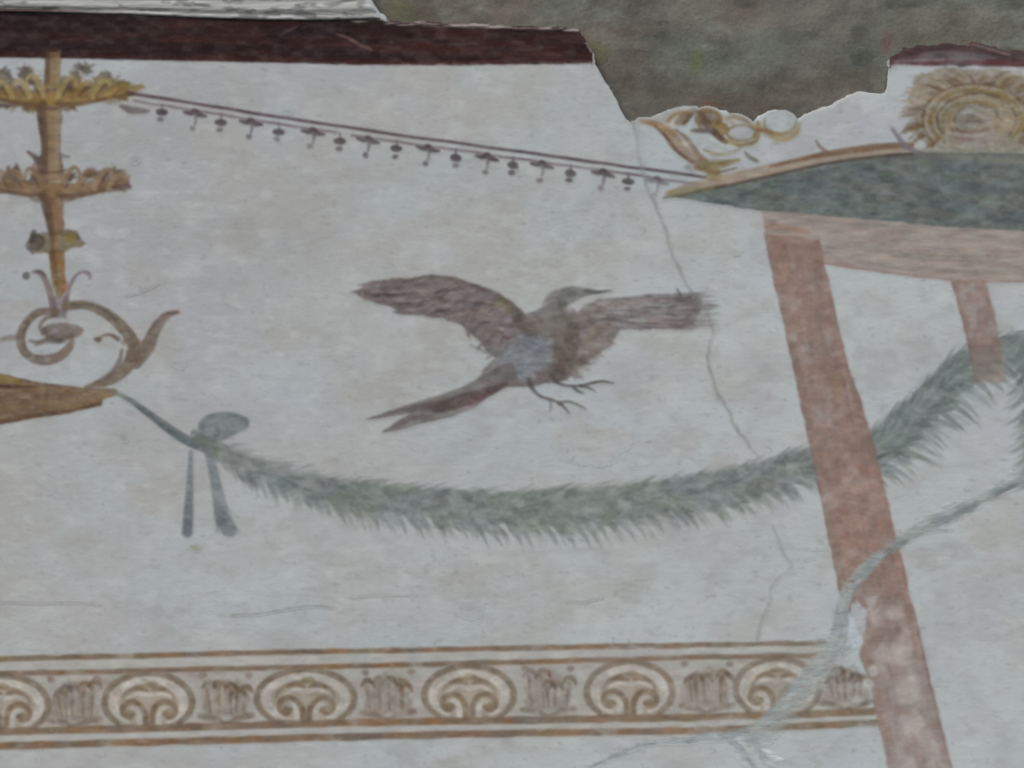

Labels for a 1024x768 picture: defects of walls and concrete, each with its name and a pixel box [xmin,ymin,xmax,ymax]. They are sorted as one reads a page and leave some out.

spalling [372,0,948,77]
spalling [961,0,1024,52]
crack [630,119,763,461]
crack [583,460,1024,768]